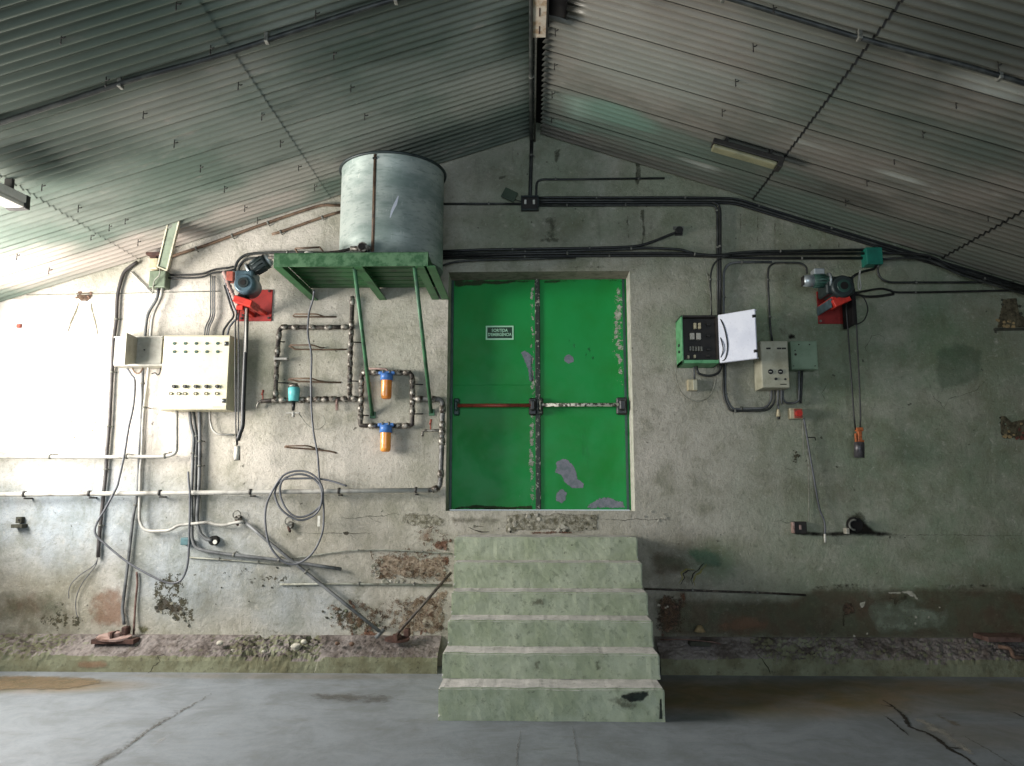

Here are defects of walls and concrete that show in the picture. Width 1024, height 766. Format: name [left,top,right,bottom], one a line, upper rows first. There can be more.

flaking render [993,298,1024,333]
peeling [521,351,534,382]
flaking render [999,416,1024,440]
spalling [506,459,625,533]
peeling [322,548,452,636]
damp [657,584,1024,638]
crack [883,700,977,766]